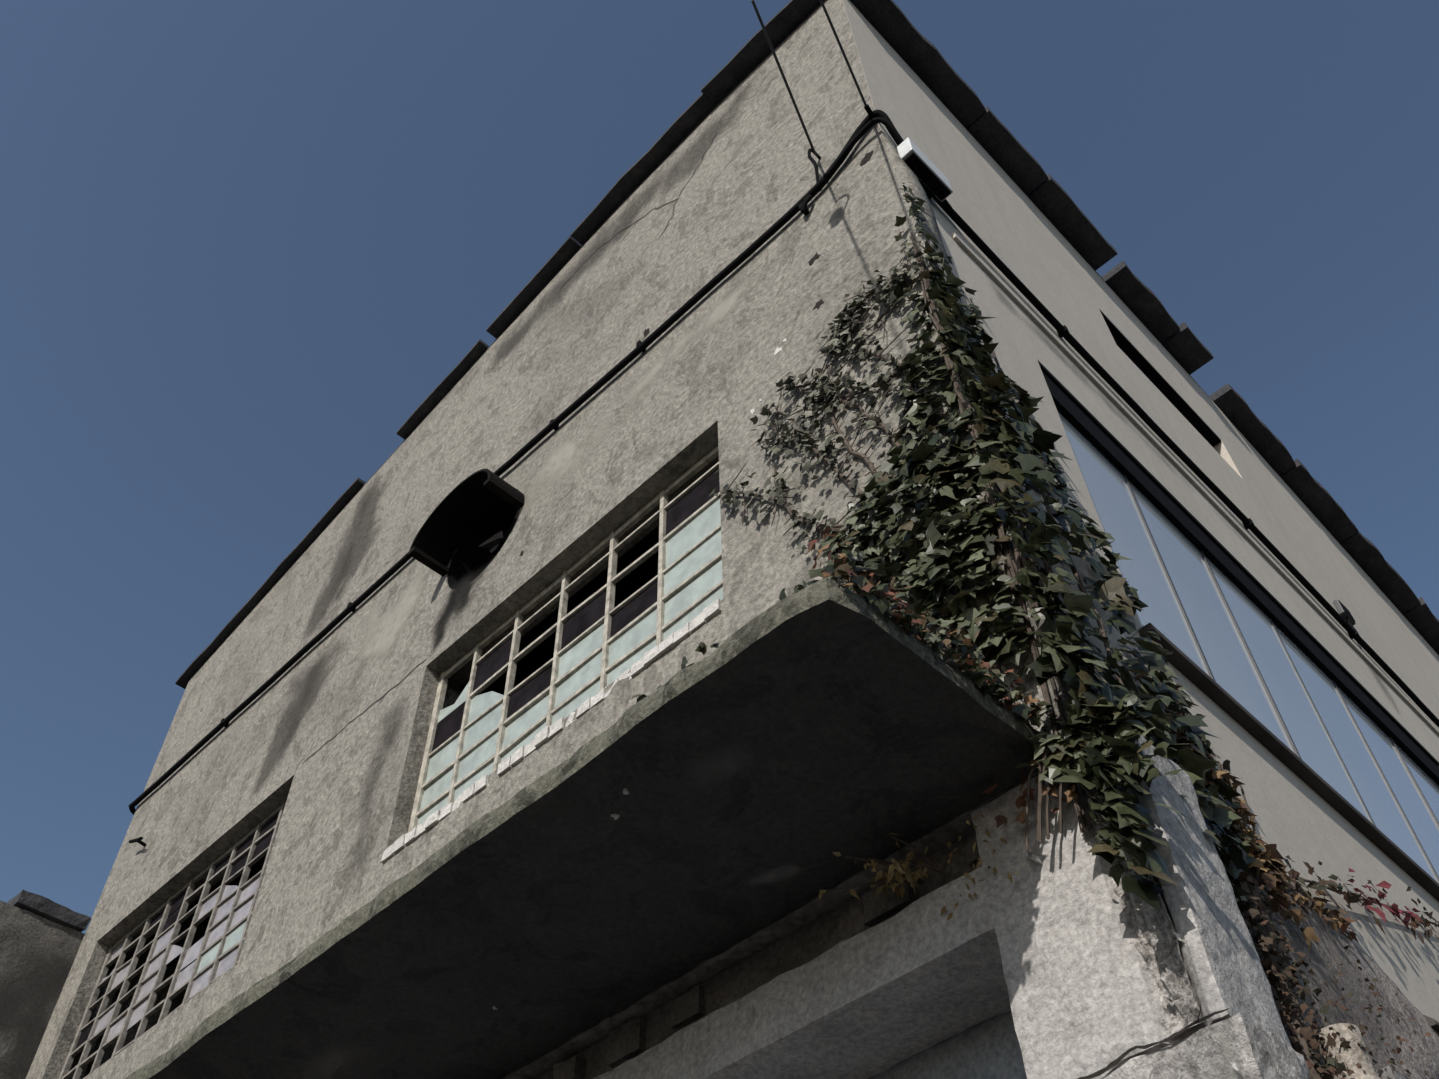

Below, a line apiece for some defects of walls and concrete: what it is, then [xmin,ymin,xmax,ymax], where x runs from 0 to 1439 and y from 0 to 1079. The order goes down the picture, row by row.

damp [312,488,376,627]
damp [362,576,421,658]
damp [259,662,326,784]
crack [1077,1005,1229,1079]